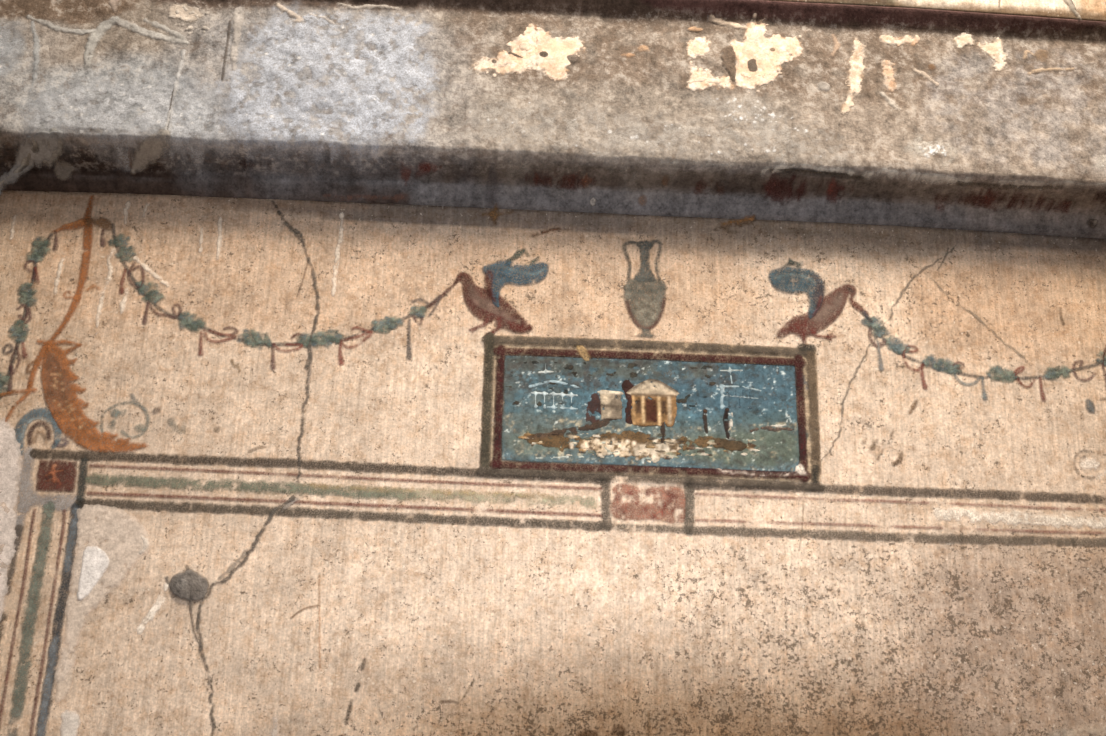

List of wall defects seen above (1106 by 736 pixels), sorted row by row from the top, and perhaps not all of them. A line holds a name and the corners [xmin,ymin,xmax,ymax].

flaking render [469,24,585,81]
flaking render [686,14,803,93]
crack [189,201,320,736]